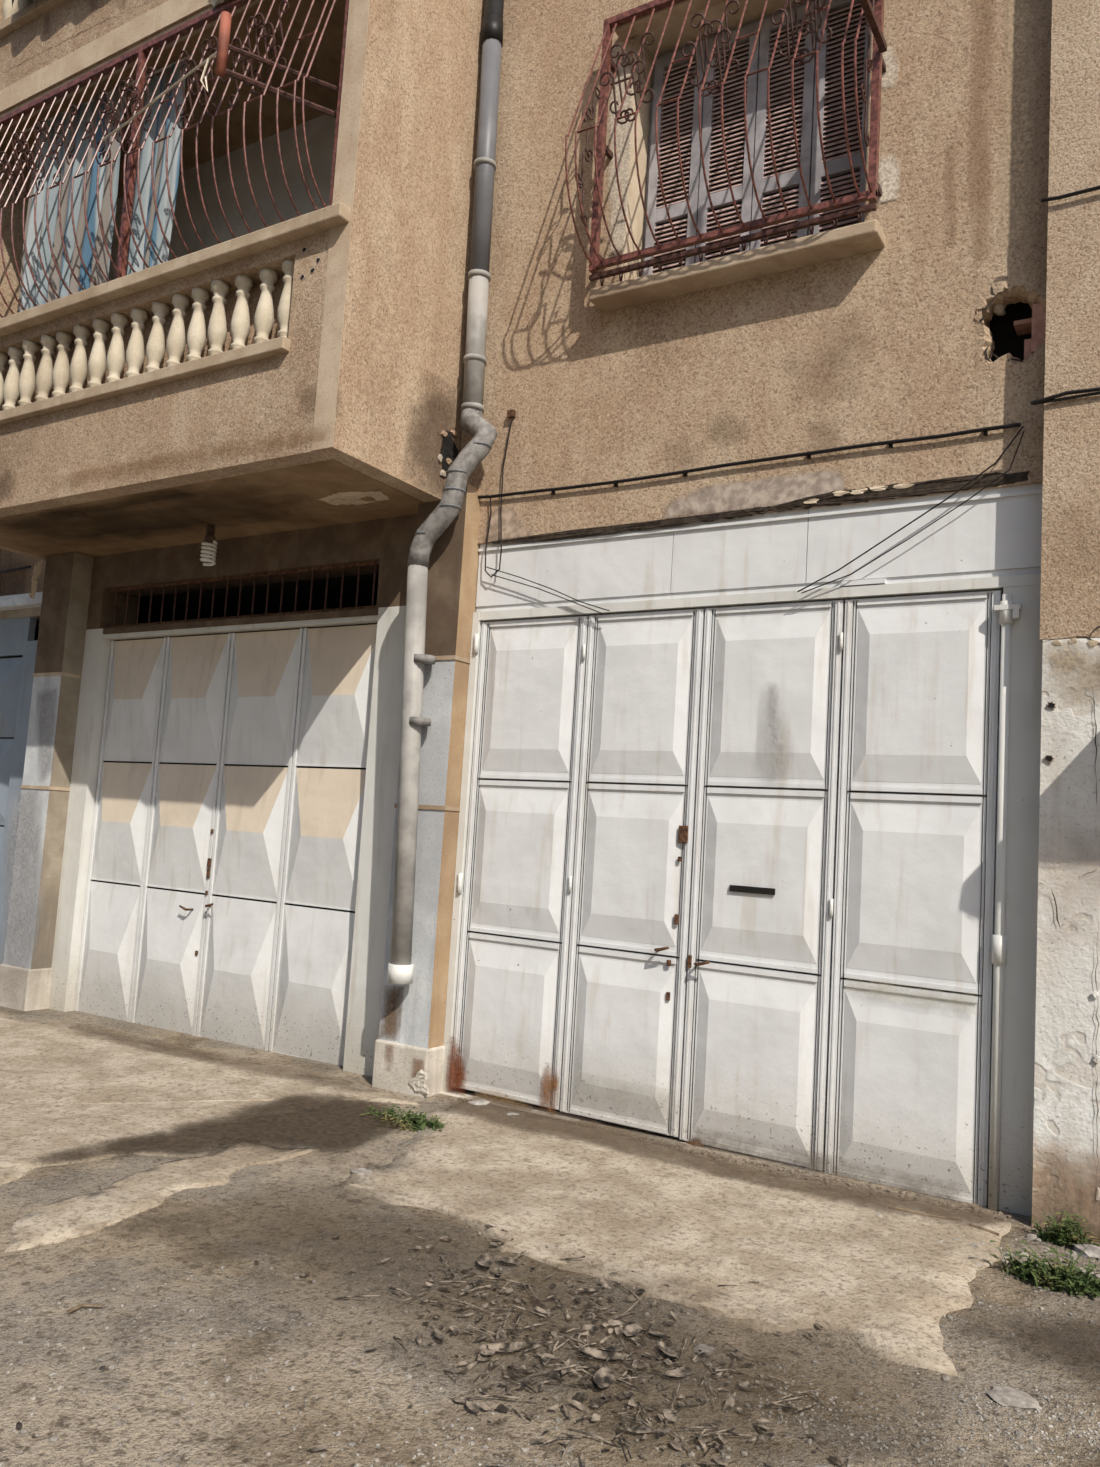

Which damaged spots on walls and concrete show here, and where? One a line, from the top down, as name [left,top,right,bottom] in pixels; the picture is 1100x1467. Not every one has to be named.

spalling [974,260,1047,388]
crack [1045,626,1100,647]
crack [1091,696,1099,804]
crack [1051,871,1094,929]
corrosion [447,1042,465,1090]
corrosion [542,1074,558,1114]
crack [1092,923,1100,1200]